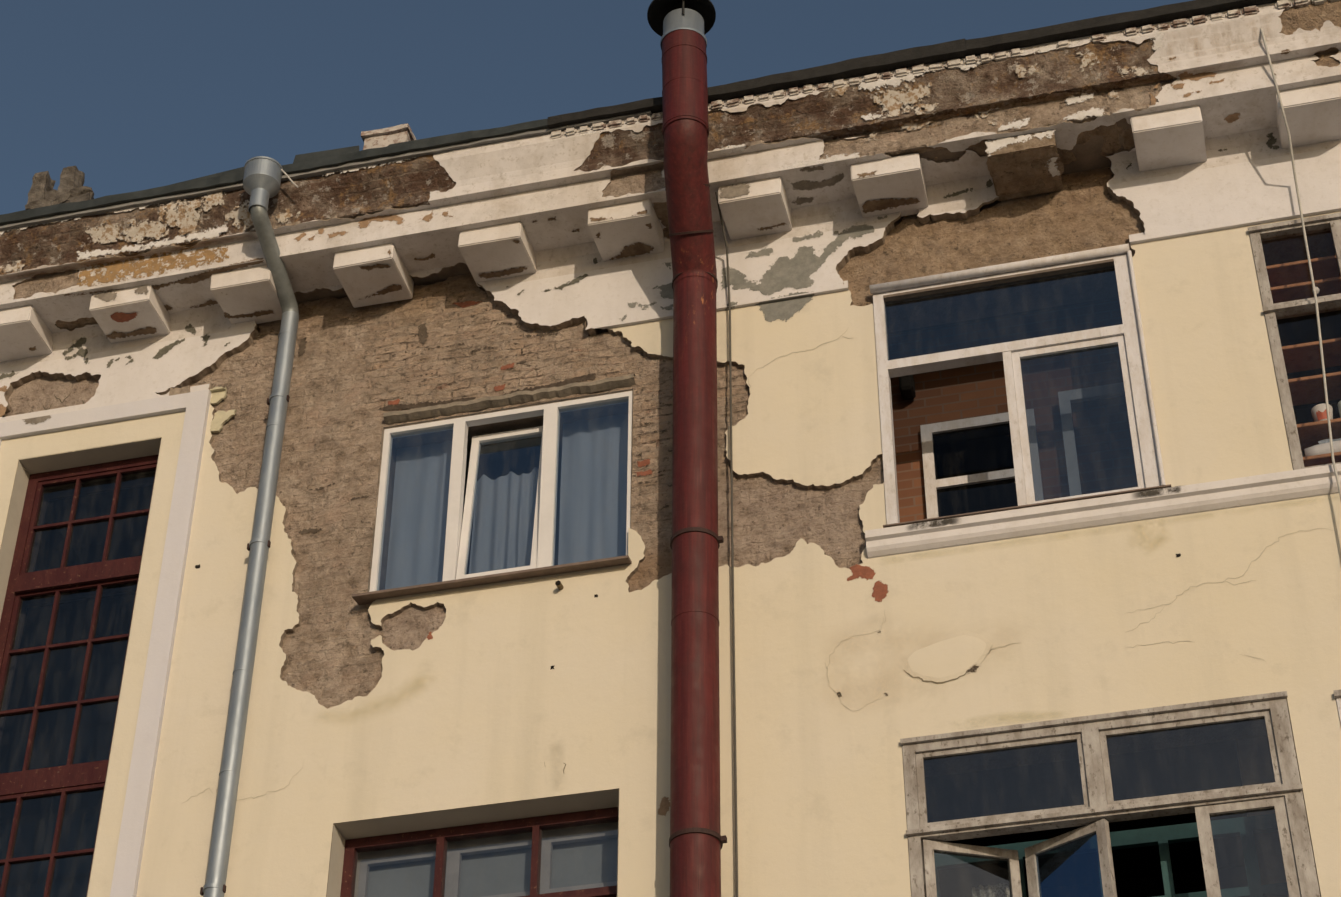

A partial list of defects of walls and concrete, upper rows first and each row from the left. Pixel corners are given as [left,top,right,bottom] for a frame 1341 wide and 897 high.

flaking render [1279,0,1341,54]
flaking render [1314,47,1340,67]
flaking render [267,149,463,241]
flaking render [359,250,391,271]
flaking render [541,119,670,292]
flaking render [708,32,1225,322]
flaking render [1224,112,1241,123]
peeling [1266,132,1279,149]
flaking render [0,188,281,494]
flaking render [276,263,673,709]
flaking render [717,364,889,602]
crack [1125,528,1330,648]